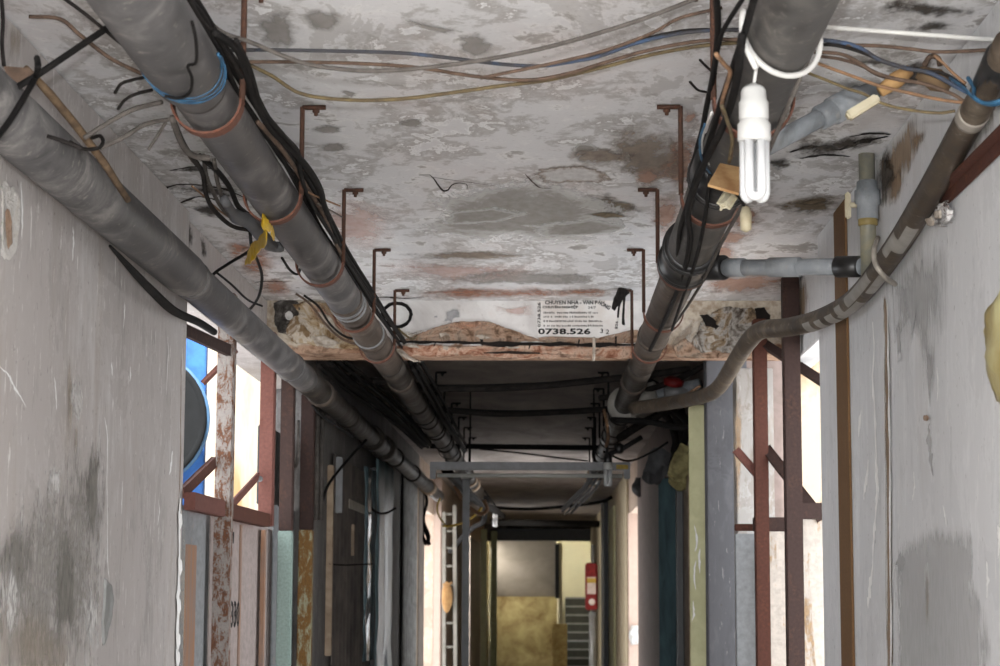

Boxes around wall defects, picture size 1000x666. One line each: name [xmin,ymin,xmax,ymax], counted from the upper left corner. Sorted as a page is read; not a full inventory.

damp [573,130,678,179]
damp [799,137,872,154]
damp [880,152,894,203]
peeling [0,180,23,261]
damp [430,180,634,259]
spalling [285,301,359,350]
spalling [396,321,638,362]
spalling [674,306,771,359]
damp [0,451,100,666]